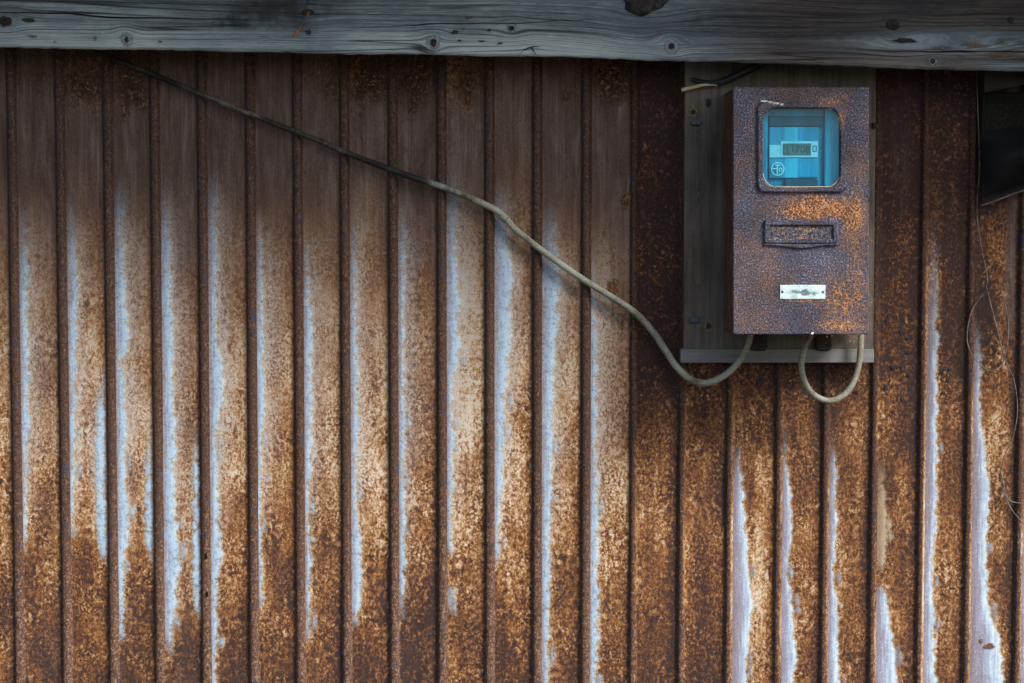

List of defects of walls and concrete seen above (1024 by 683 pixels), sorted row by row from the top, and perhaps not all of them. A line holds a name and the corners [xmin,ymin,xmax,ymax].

rust [594,59,631,105]
rust [776,156,874,344]
rust [607,279,619,294]